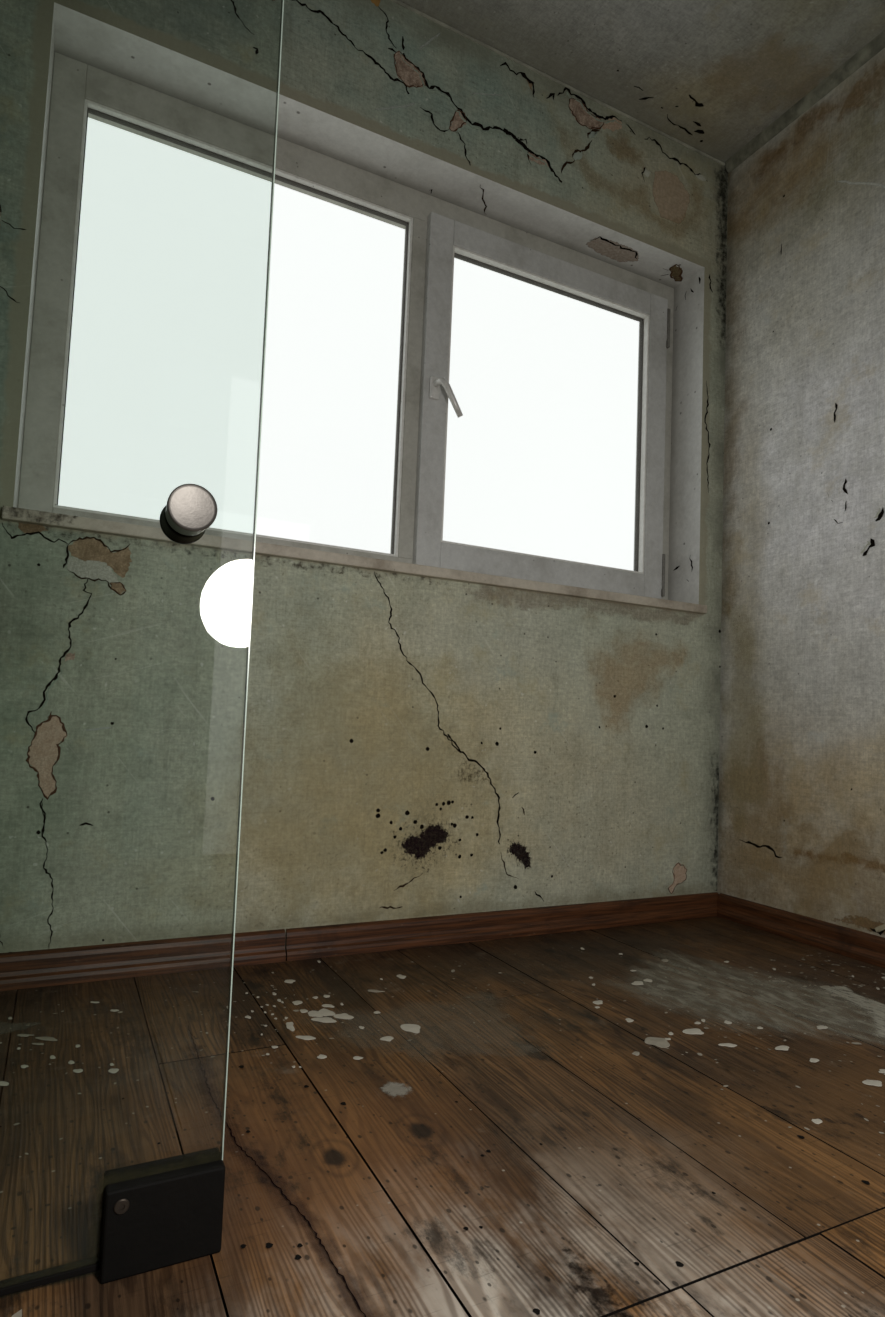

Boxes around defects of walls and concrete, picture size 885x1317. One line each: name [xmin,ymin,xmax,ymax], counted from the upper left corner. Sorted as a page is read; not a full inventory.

crack [287,0,707,185]
crack [2,522,68,544]
flaking render [63,536,132,596]
crack [25,579,92,733]
flaking render [26,711,67,800]
crack [374,571,544,901]
crack [40,798,54,944]
damp [376,800,479,872]
damp [507,842,532,869]